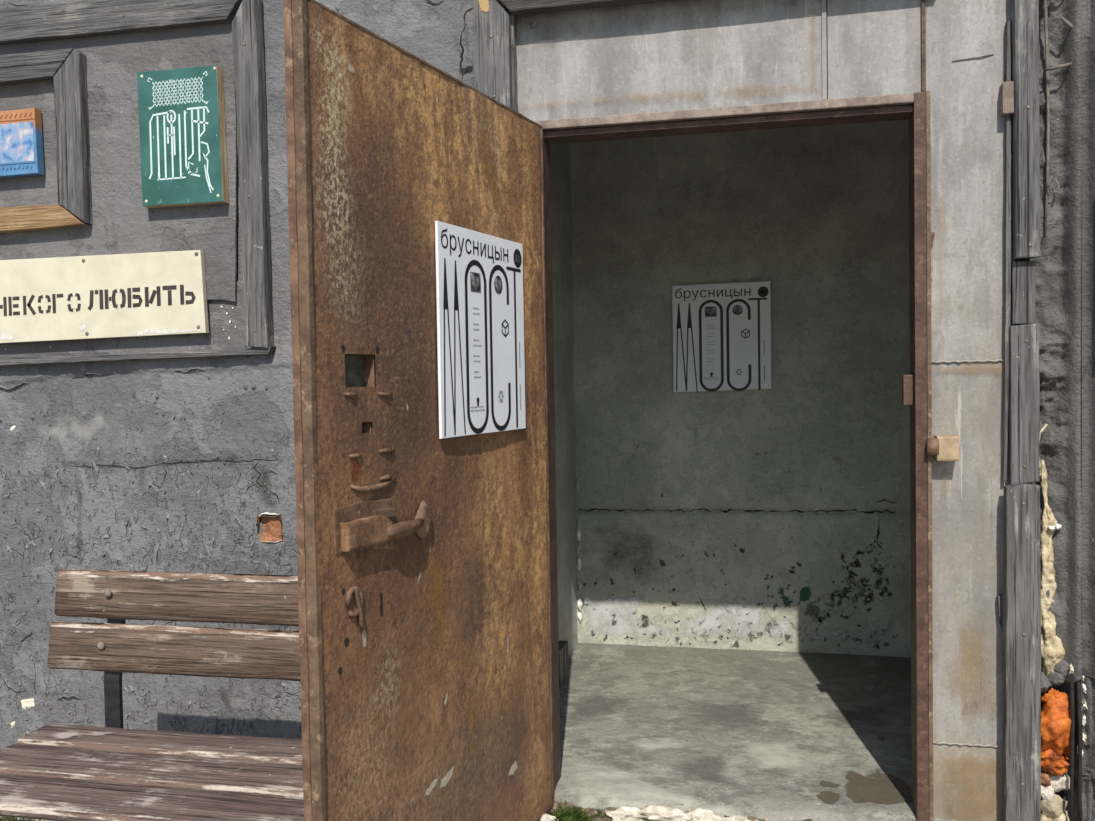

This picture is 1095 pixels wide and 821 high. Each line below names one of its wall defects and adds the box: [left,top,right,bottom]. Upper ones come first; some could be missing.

peeling [478,0,490,12]
spalling [1023,0,1095,821]
peeling [576,518,895,650]
water stain [817,771,912,804]